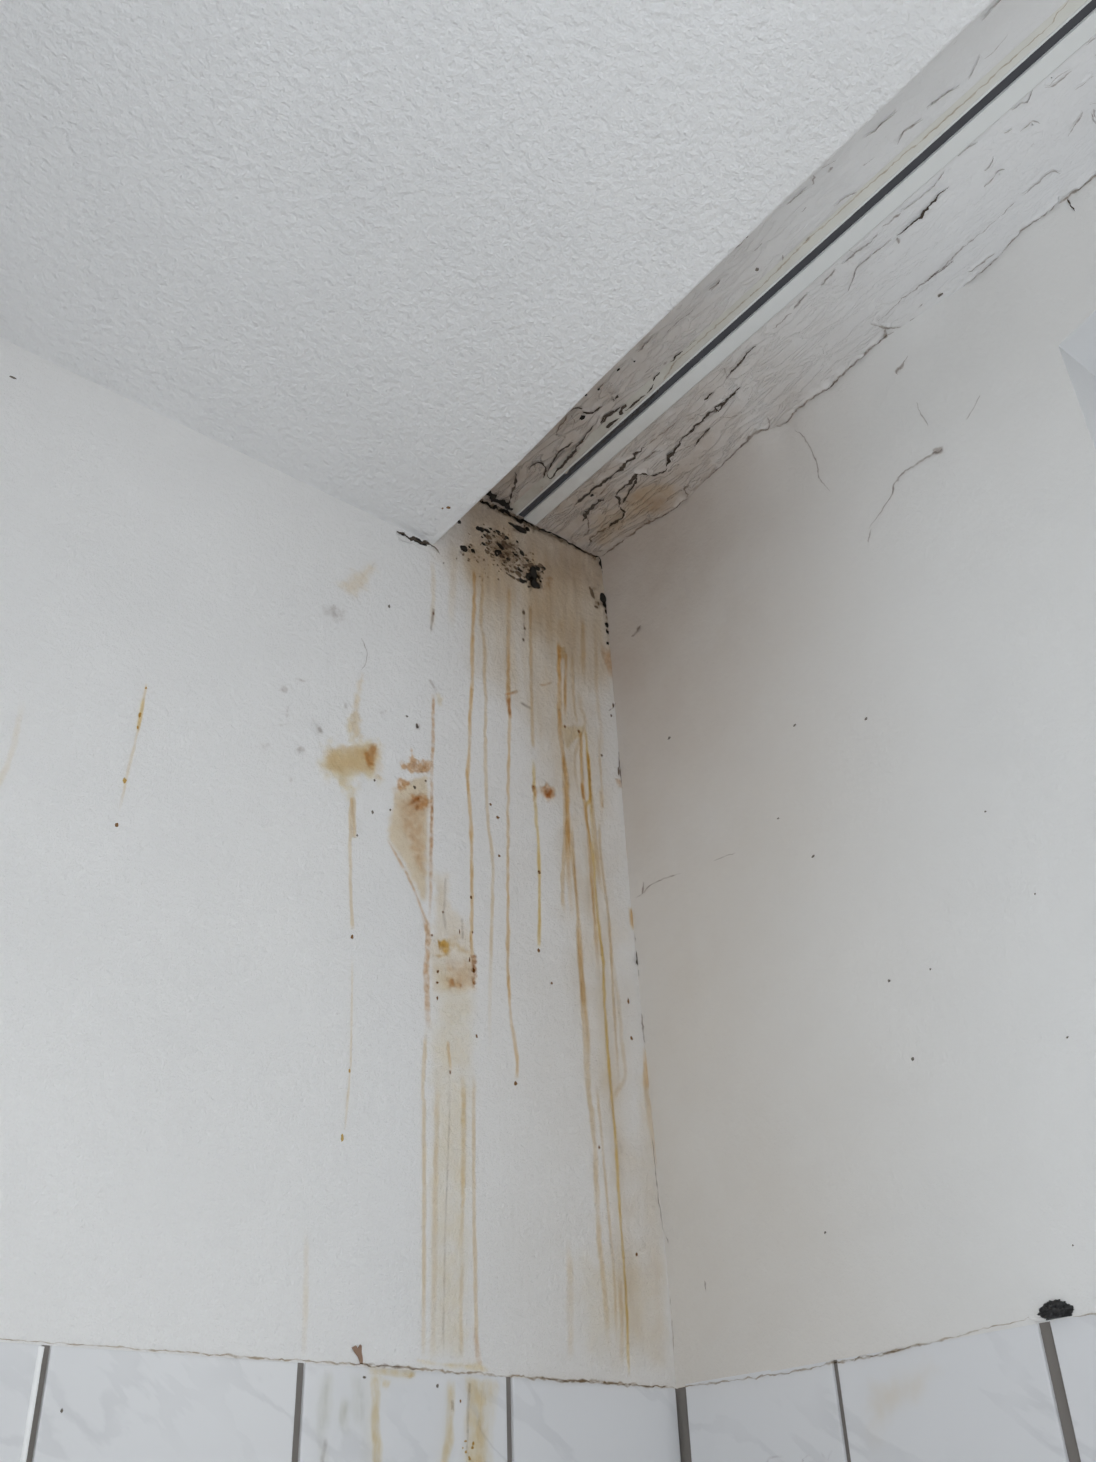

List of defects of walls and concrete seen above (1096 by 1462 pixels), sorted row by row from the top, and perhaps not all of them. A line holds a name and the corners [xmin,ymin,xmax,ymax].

damp [443,490,603,589]
damp [589,586,609,645]